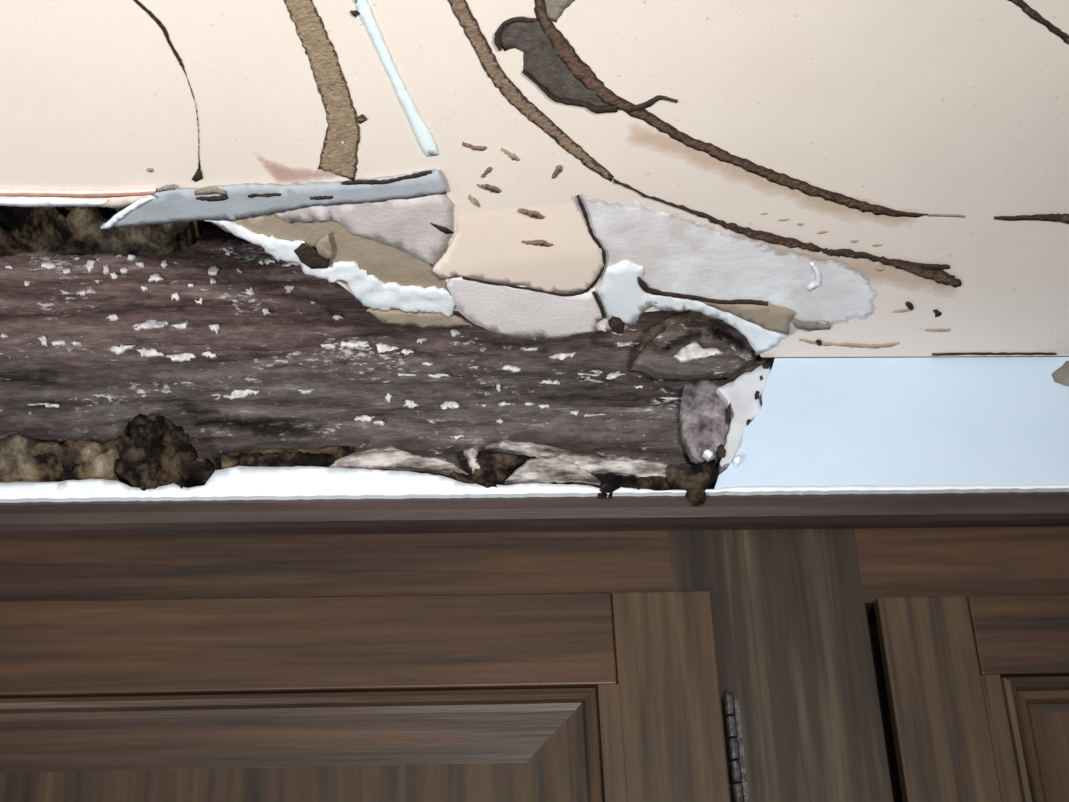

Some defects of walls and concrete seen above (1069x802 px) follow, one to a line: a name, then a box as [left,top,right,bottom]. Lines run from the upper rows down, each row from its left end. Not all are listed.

crack [134,0,203,182]
crack [627,95,678,112]
spalling [462,142,487,151]
peeling [31,254,167,292]
flaking render [100,167,875,475]
peeling [38,335,81,346]